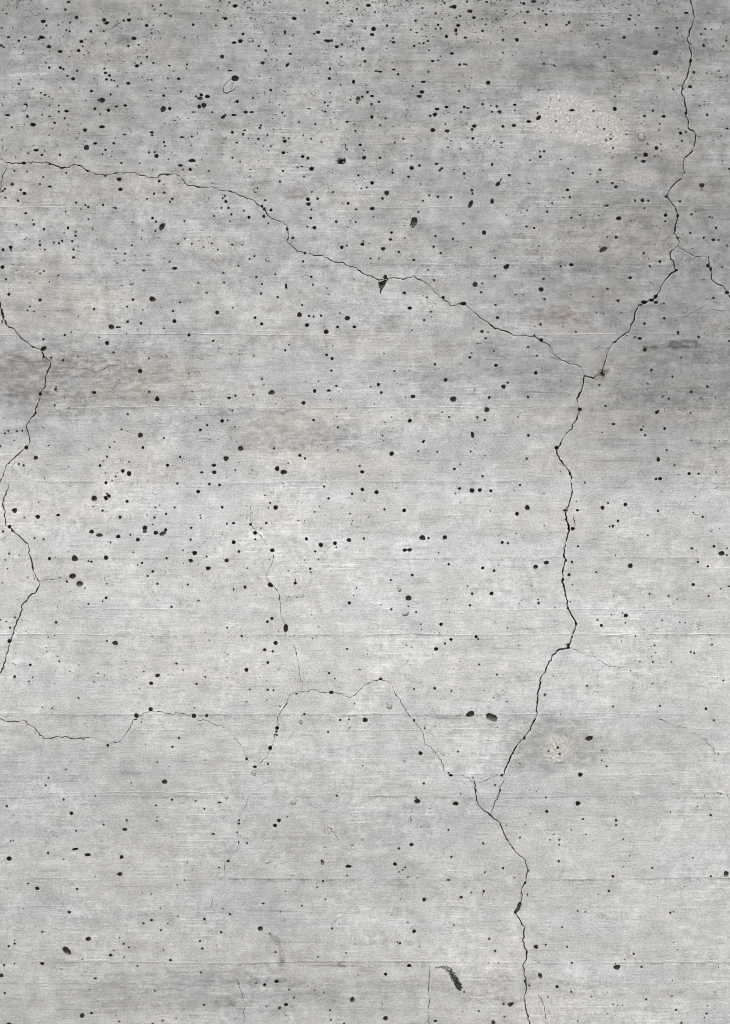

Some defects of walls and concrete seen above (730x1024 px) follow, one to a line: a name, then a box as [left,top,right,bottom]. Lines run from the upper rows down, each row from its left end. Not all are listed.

crack [0,158,262,207]
crack [0,296,115,674]
crack [265,0,730,1024]
crack [0,710,248,760]